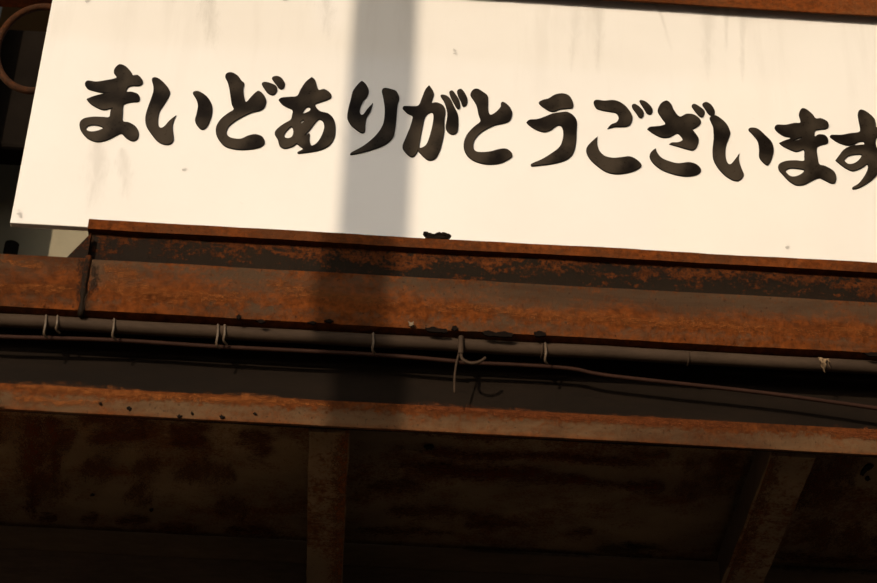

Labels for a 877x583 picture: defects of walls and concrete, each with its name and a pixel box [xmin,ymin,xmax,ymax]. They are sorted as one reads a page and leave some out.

corrosion [13,382,328,457]
corrosion [387,404,739,427]
corrosion [421,433,546,443]